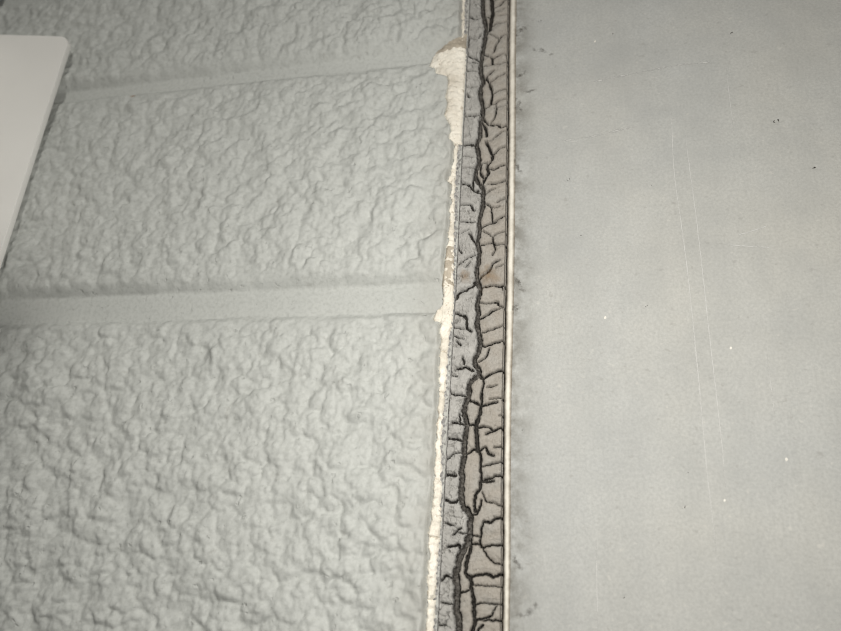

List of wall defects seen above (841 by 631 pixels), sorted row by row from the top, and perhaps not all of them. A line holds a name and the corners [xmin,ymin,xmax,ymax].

spalling [426,0,467,631]
crack [441,0,510,631]